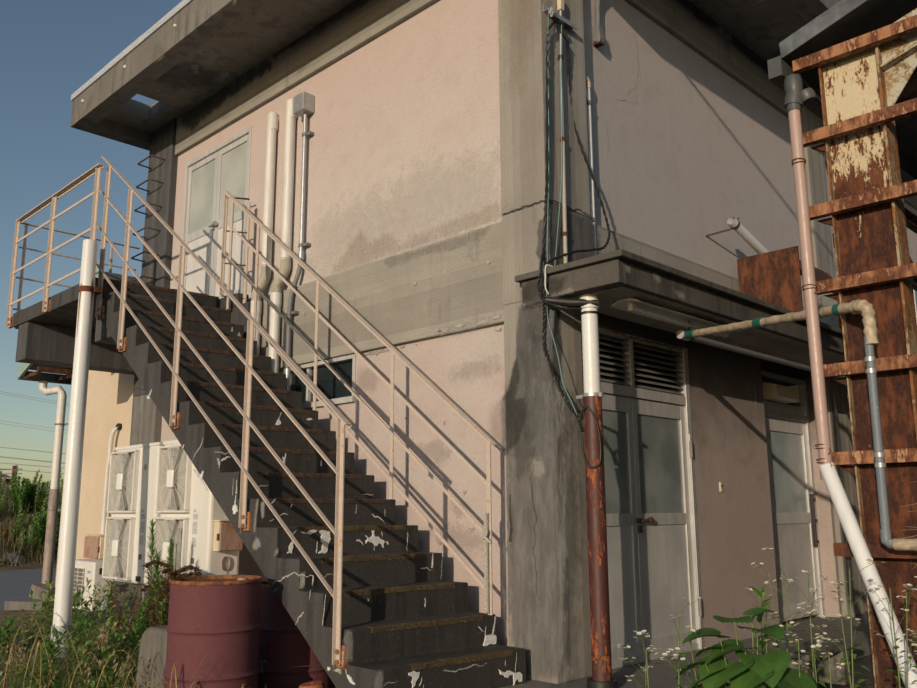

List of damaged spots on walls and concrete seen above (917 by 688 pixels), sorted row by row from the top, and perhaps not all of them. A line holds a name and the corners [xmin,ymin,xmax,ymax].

water stain [156,0,366,130]
water stain [536,202,596,269]
water stain [501,279,566,680]
peeling [287,529,331,554]
peeling [356,530,389,550]
peeling [478,617,497,646]
peeling [408,671,424,688]
peeling [498,653,522,685]